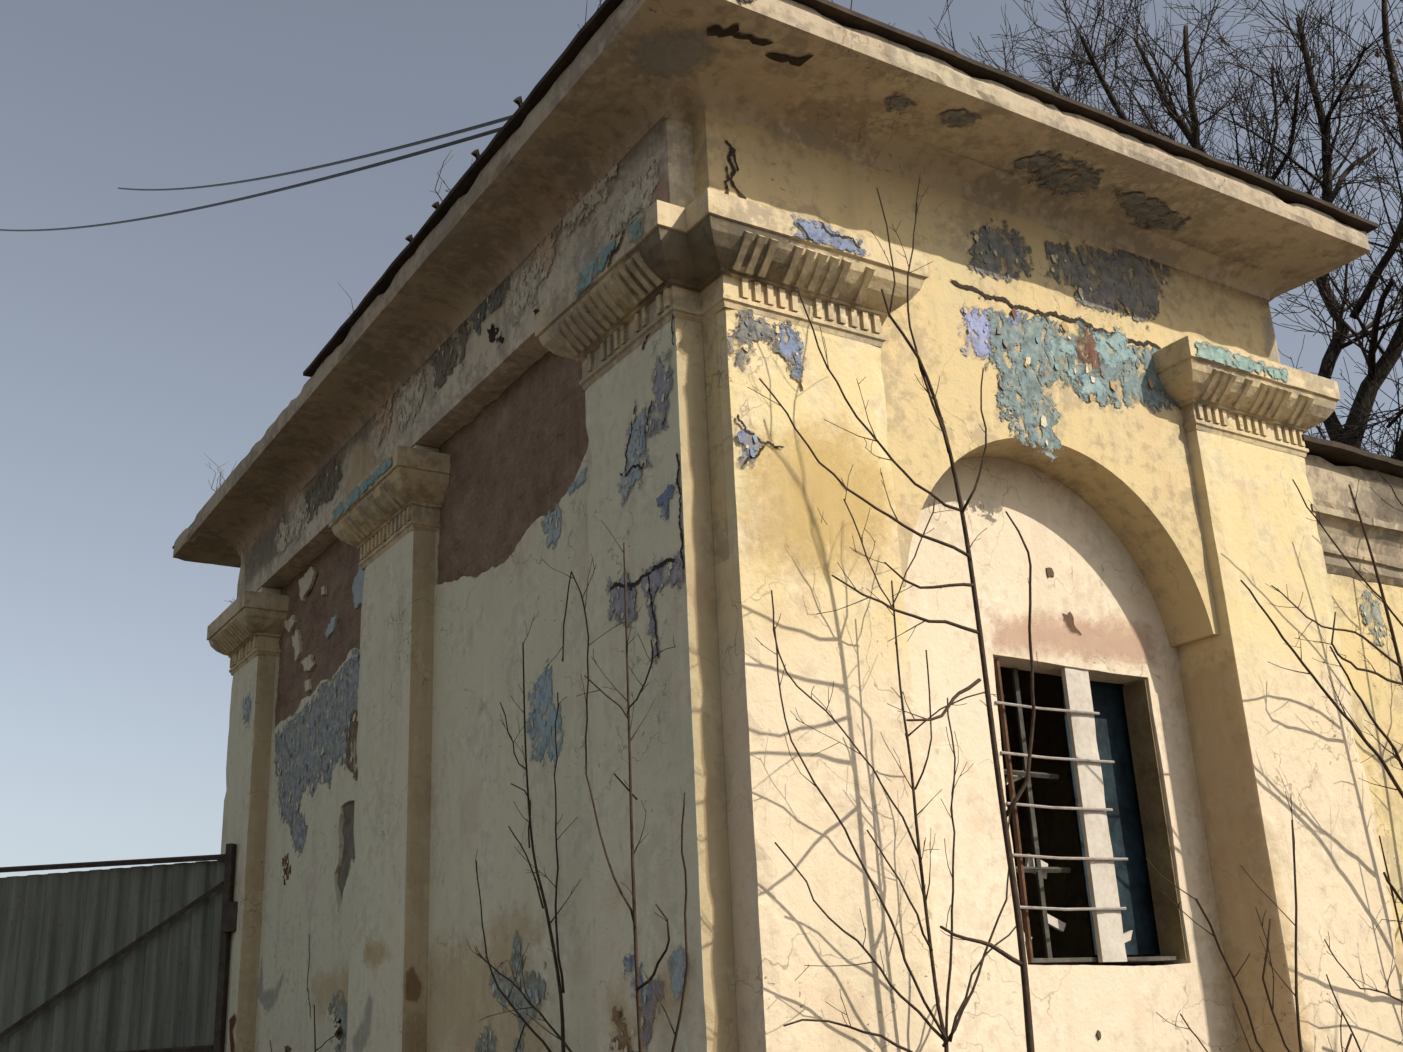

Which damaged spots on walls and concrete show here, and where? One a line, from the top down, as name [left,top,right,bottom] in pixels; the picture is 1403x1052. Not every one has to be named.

crack [724,140,746,199]
peeling [727,309,806,388]
crack [950,279,1161,363]
peeling [958,218,1181,462]
peeling [616,348,675,507]
spalling [274,158,660,855]
peeling [656,477,677,522]
peeling [606,551,684,668]
spalling [334,801,355,900]
peeling [328,991,348,1052]
peeling [474,929,548,1052]
peeling [607,943,690,1052]